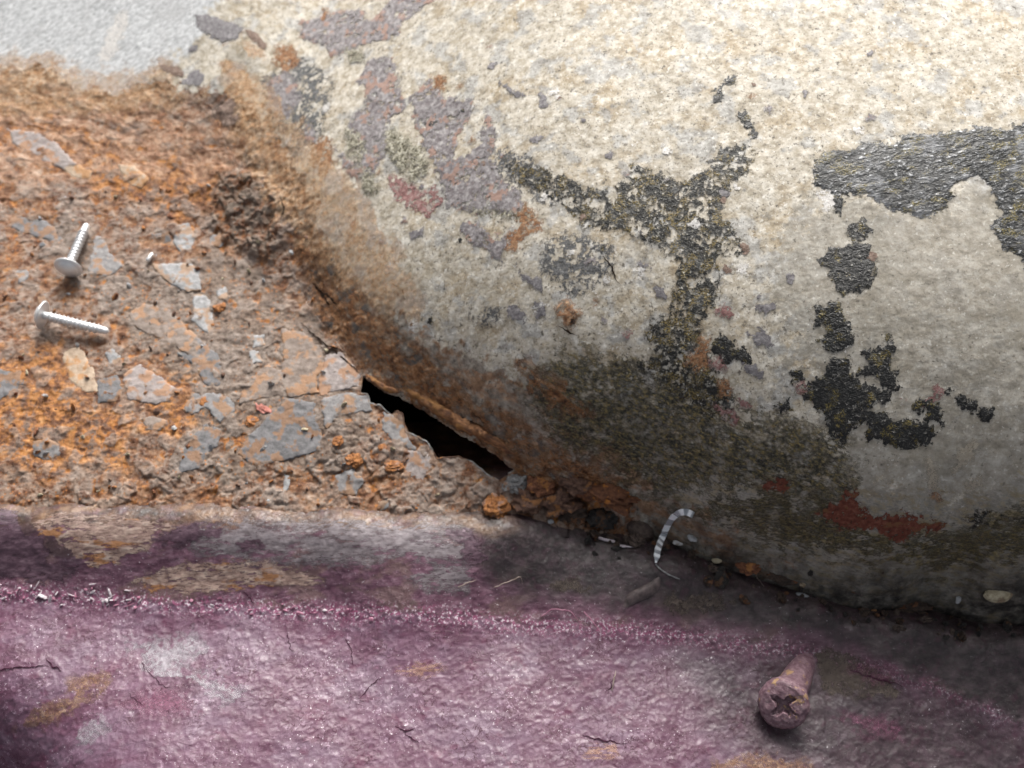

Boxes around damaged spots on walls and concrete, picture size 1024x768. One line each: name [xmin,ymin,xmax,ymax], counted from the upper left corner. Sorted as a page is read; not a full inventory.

peeling [297,0,435,57]
corrosion [272,45,300,72]
peeling [498,80,548,108]
corrosion [7,128,92,180]
peeling [331,56,524,266]
corrosion [88,236,123,276]
corrosion [152,223,194,251]
corrosion [177,135,619,489]
corrosion [142,416,167,431]
corrosion [32,437,61,460]
corrosion [335,468,364,496]
corrosion [815,487,947,543]